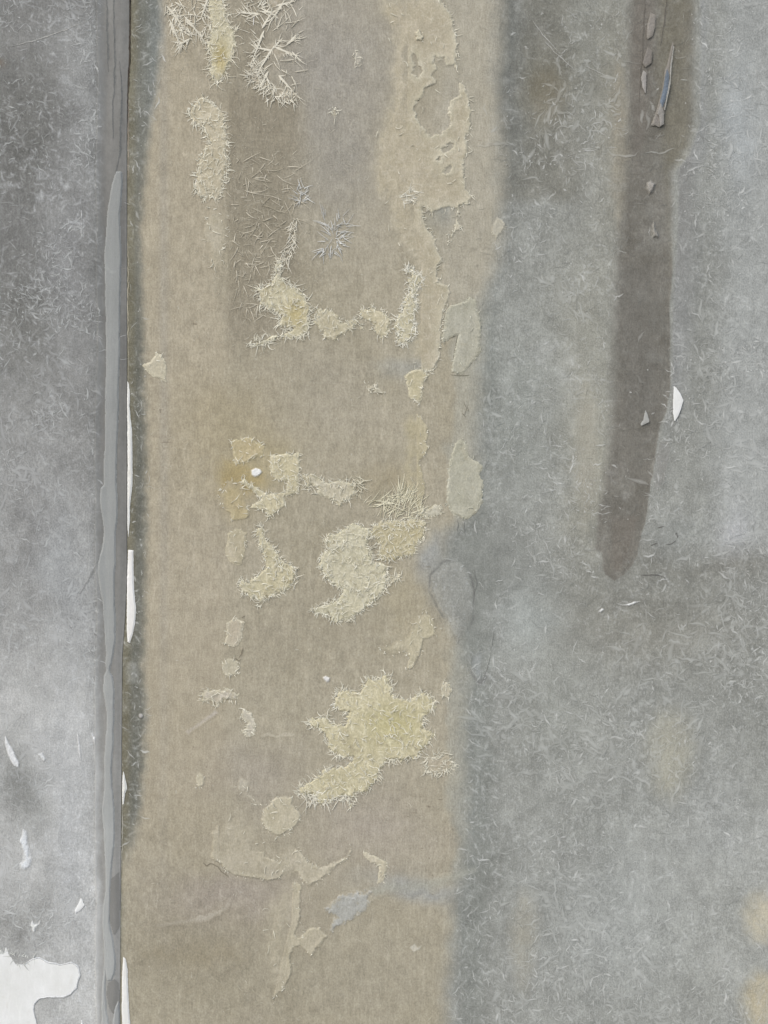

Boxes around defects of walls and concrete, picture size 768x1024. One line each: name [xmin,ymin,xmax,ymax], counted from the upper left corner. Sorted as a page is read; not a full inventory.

peeling [76,0,516,1024]
water stain [567,0,699,582]
spalling [0,948,81,1024]